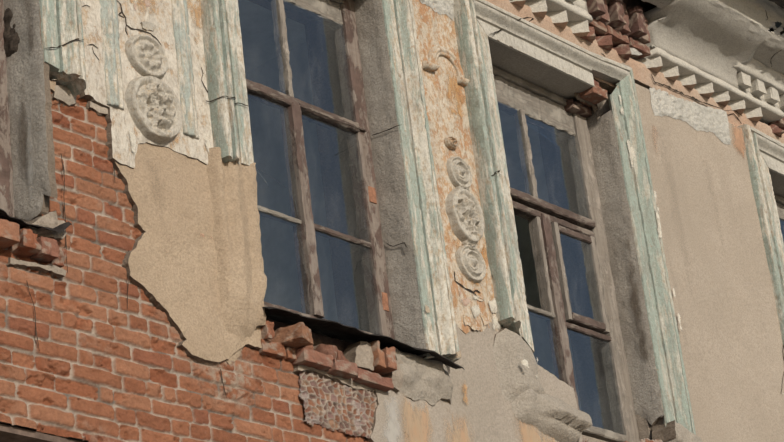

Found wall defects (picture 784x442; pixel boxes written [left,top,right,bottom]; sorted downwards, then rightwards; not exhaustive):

crack [45,38,99,60]
crack [117,0,162,46]
flaking render [420,0,454,21]
spalling [580,0,651,67]
crack [201,67,248,106]
flaking render [649,88,731,145]
crack [651,74,744,125]
spalling [767,118,784,142]
spalling [0,77,377,442]
peeling [463,293,500,331]